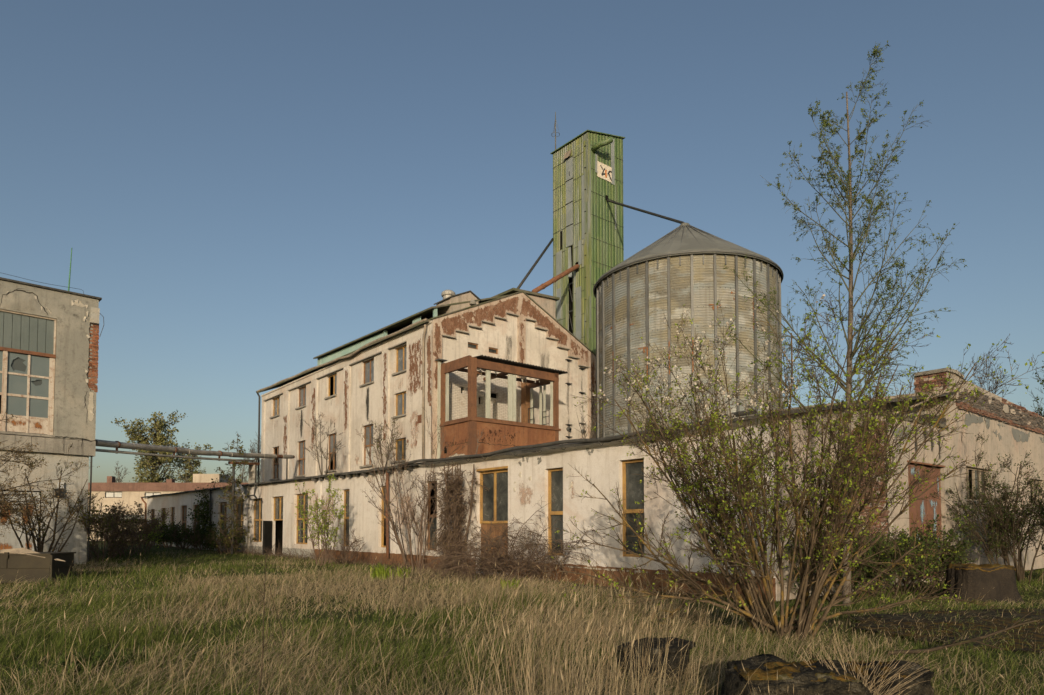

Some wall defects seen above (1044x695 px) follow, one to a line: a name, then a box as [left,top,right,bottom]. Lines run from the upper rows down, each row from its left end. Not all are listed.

crack [0,288,48,314]
flaking render [71,299,100,421]
peeling [408,296,596,427]
flaking render [955,385,1044,443]
peeling [513,457,542,504]